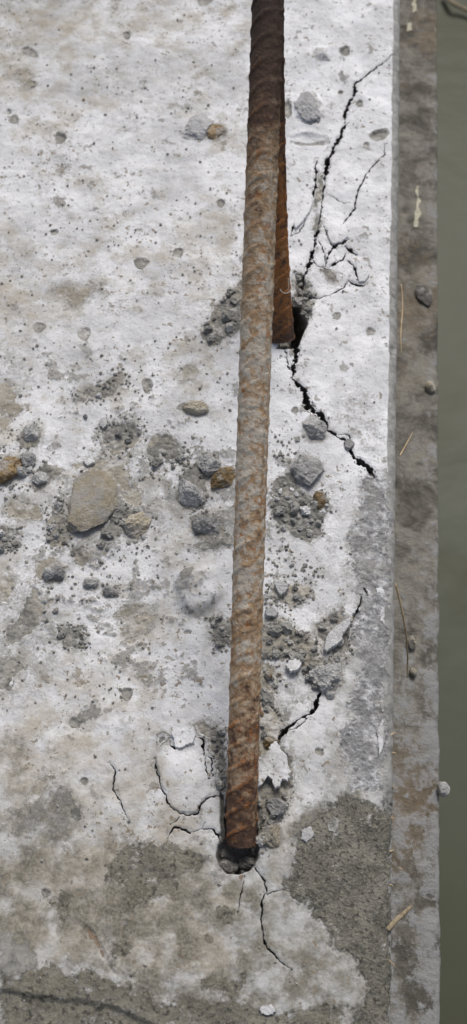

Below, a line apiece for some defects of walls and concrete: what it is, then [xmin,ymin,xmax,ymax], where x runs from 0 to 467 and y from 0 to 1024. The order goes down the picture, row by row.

crack [289,54,395,300]
spalling [156,0,394,853]
crack [283,344,376,477]
crack [351,589,368,623]
crack [278,692,323,744]
leakage [0,794,393,1024]
crack [236,865,292,971]